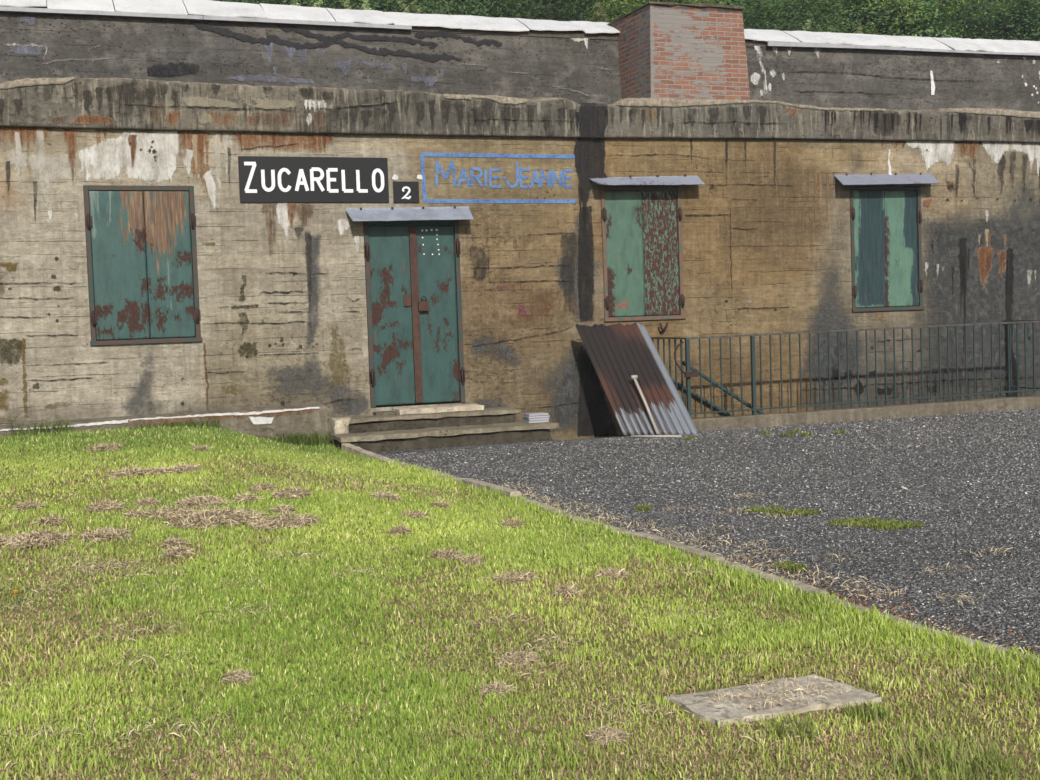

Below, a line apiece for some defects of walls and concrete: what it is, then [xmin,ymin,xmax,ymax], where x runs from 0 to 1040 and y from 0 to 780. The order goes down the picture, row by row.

damp [0,99,22,117]
damp [951,112,971,132]
damp [1006,115,1040,135]
corrosion [0,115,112,221]
damp [557,206,598,322]
damp [925,152,1040,381]
corrosion [977,229,1006,285]